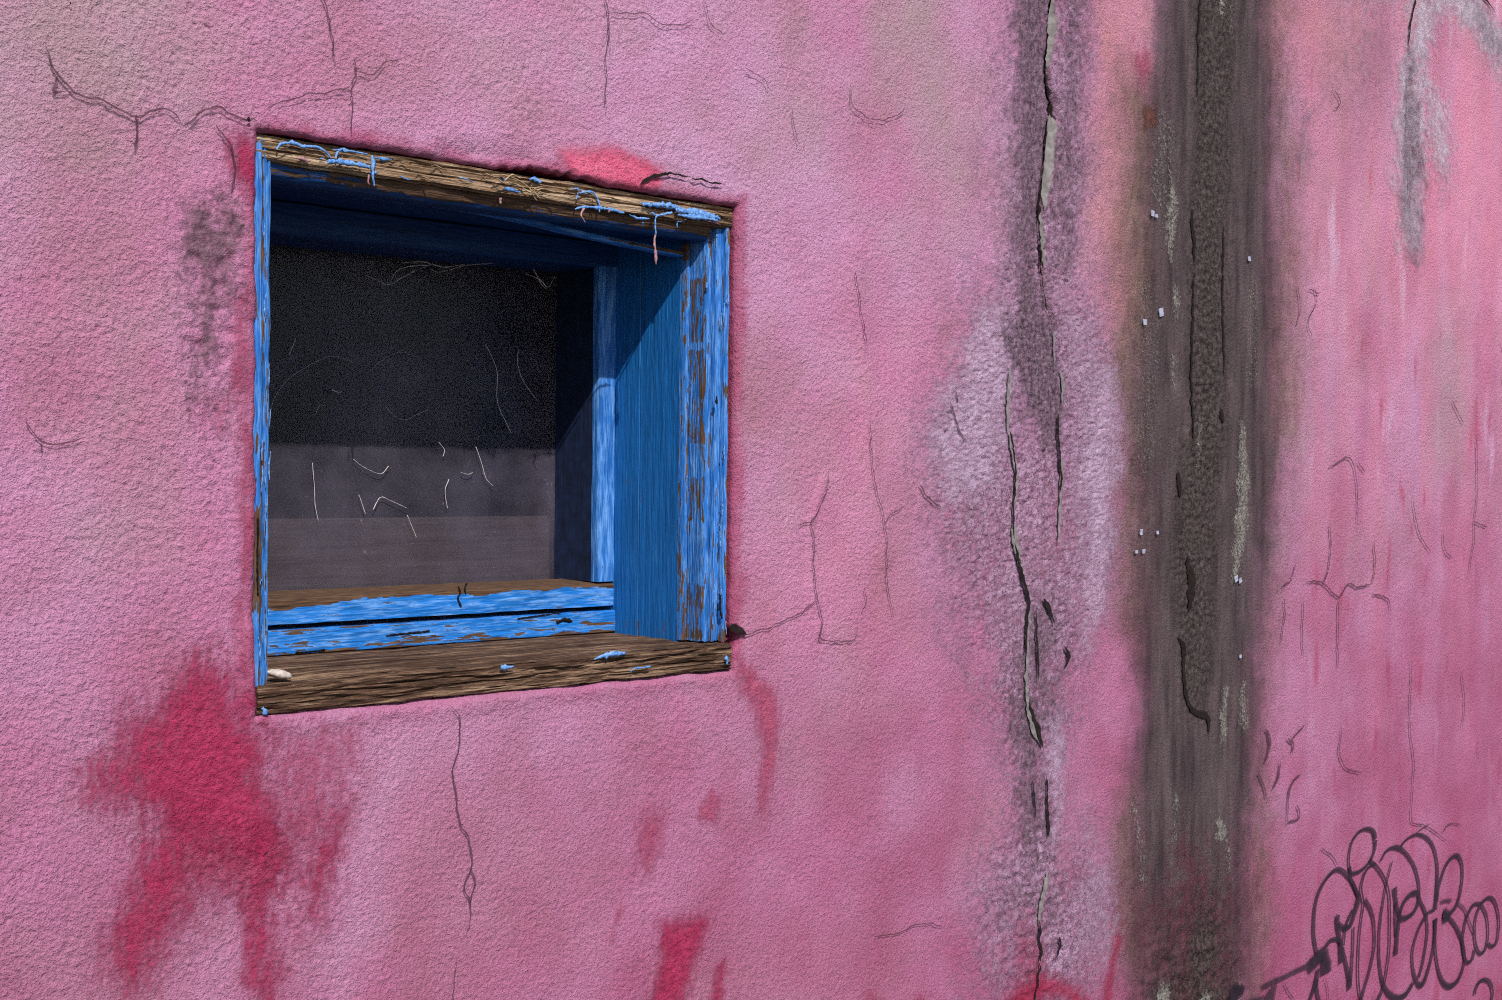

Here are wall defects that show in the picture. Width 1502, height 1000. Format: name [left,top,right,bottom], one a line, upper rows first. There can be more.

crack [45,0,401,190]
crack [605,0,722,111]
crack [1408,0,1416,52]
crack [640,172,722,185]
water stain [184,194,248,359]
crack [1037,0,1065,542]
crack [1296,284,1320,340]
water stain [1114,0,1290,1000]
crack [1006,368,1071,1000]